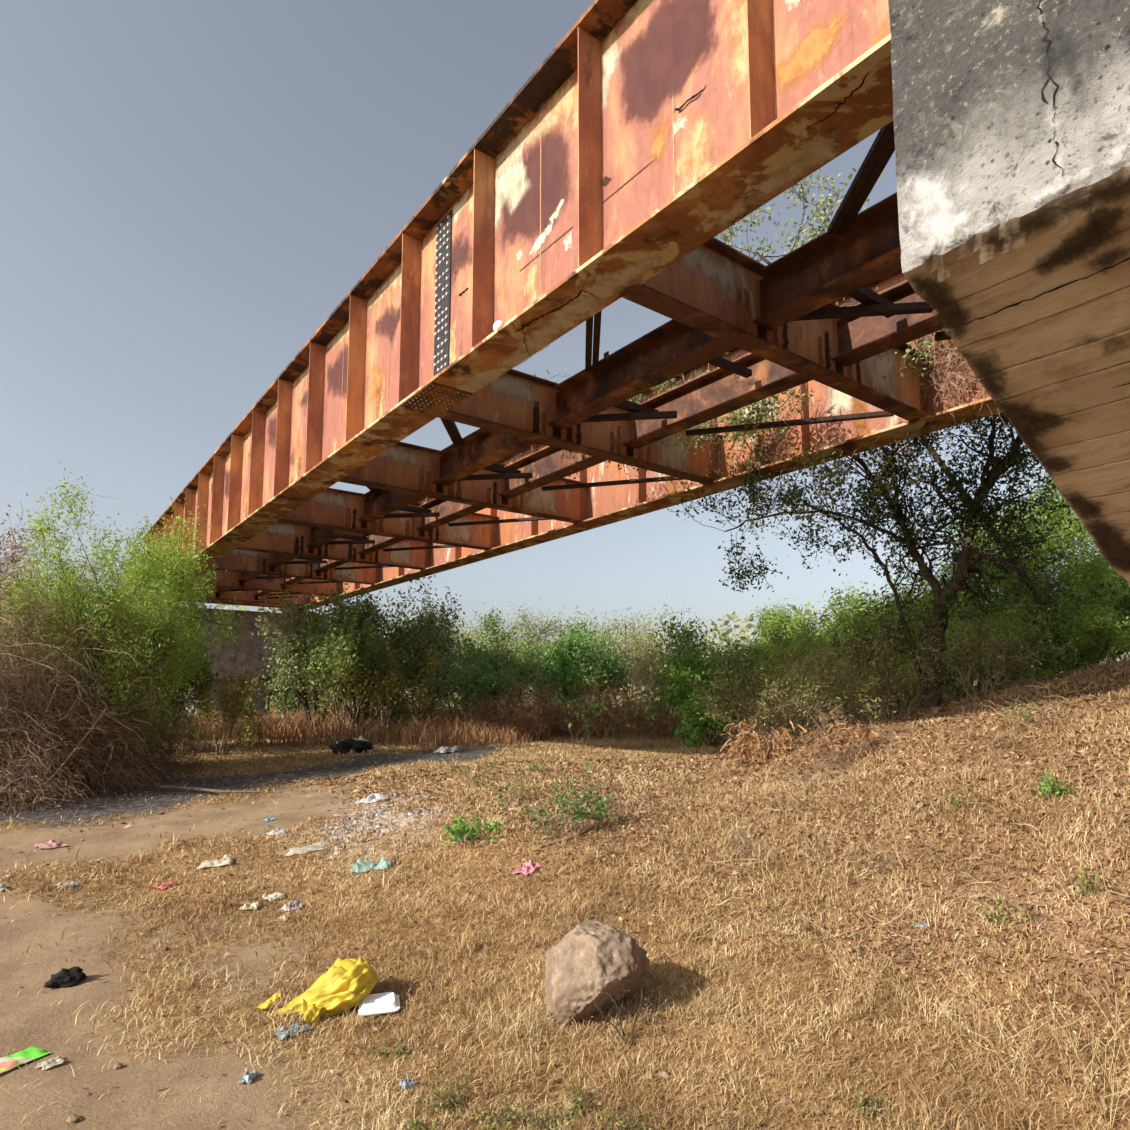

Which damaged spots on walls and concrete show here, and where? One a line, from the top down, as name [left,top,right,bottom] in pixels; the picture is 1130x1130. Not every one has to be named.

corrosion [606,0,714,160]
corrosion [727,0,748,82]
crack [1036,0,1065,195]
corrosion [494,80,578,243]
leakage [904,176,973,253]
leakage [985,158,1130,275]
corrosion [367,267,402,340]
crack [515,290,598,355]
leakage [911,278,969,338]
crack [965,258,1130,325]
leakage [961,352,1072,474]
leakage [1067,494,1130,573]